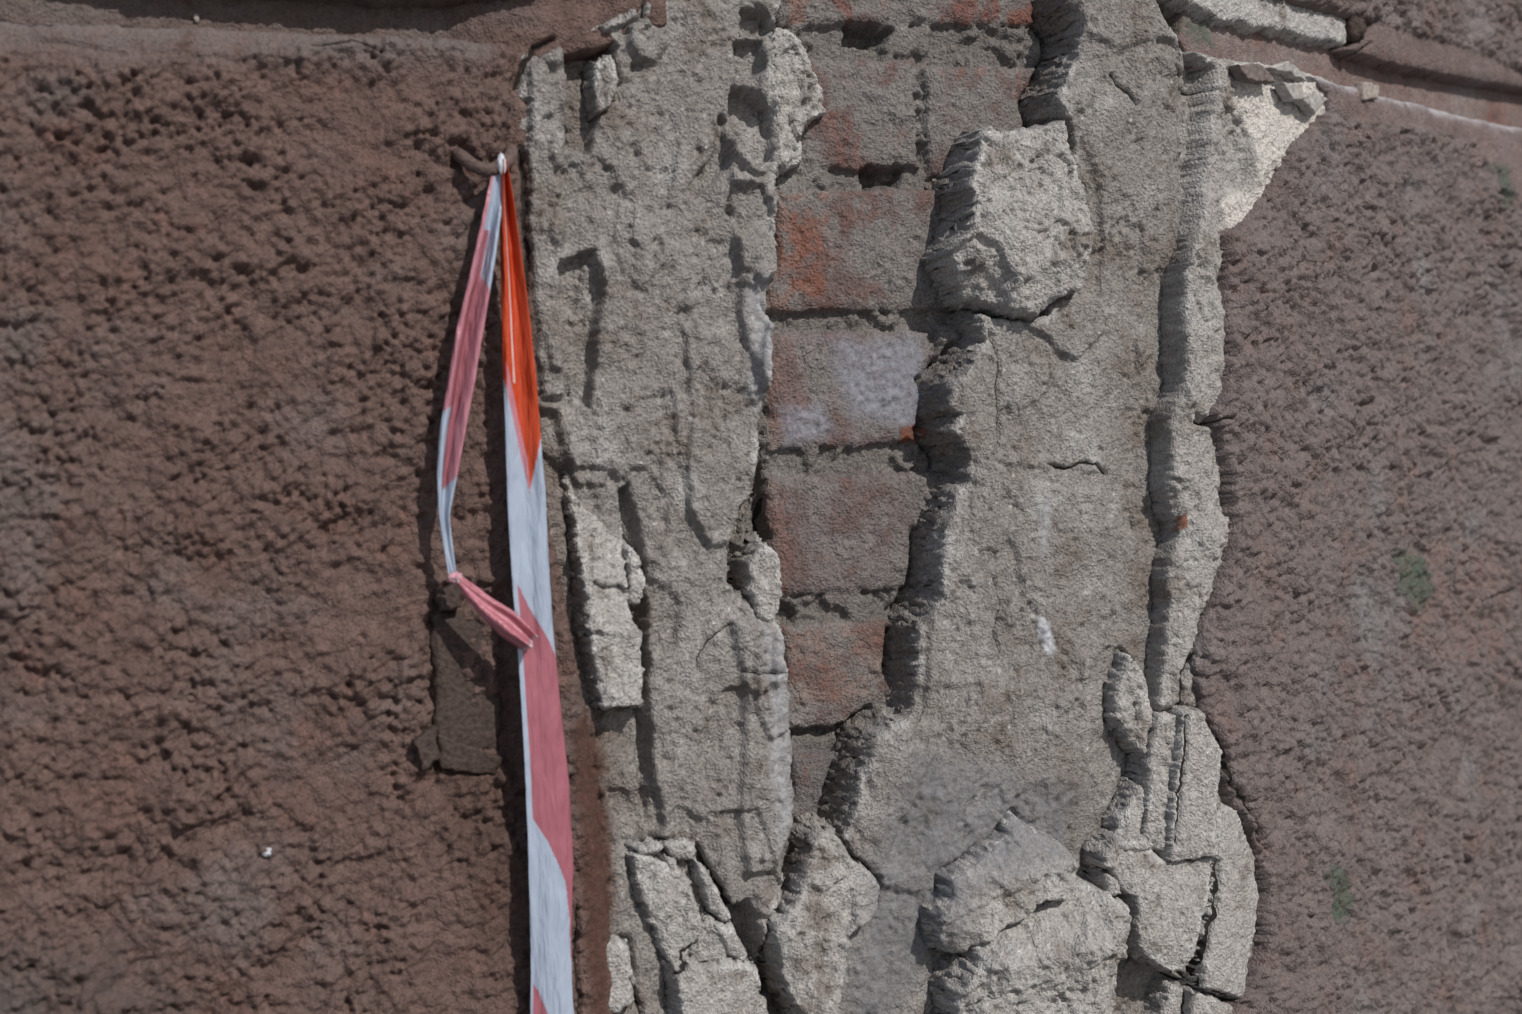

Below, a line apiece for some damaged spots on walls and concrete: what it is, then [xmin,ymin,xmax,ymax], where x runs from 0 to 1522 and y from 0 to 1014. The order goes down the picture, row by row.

crack [988,329,999,442]
crack [752,498,763,535]
spalling [516,0,1347,1014]
crack [1048,462,1104,474]
crack [1174,652,1260,843]
crack [573,903,581,1014]
crack [622,942,695,1014]
crack [695,846,753,961]
crack [824,826,878,883]